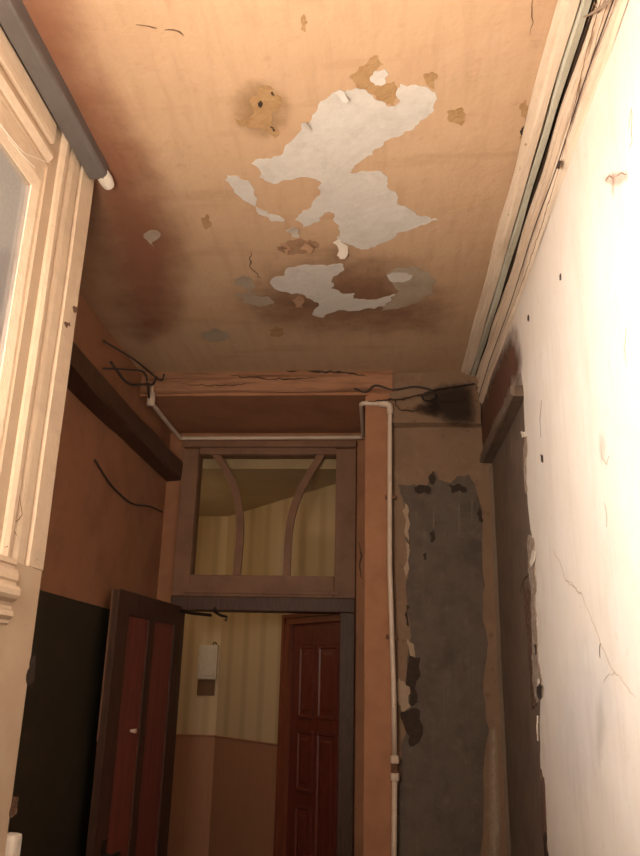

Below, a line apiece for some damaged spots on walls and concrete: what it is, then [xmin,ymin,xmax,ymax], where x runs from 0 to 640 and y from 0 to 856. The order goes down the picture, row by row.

peeling [225,56,439,318]
spalling [447,108,466,126]
peeling [396,471,489,856]
spalling [520,535,544,741]
crack [553,550,636,698]